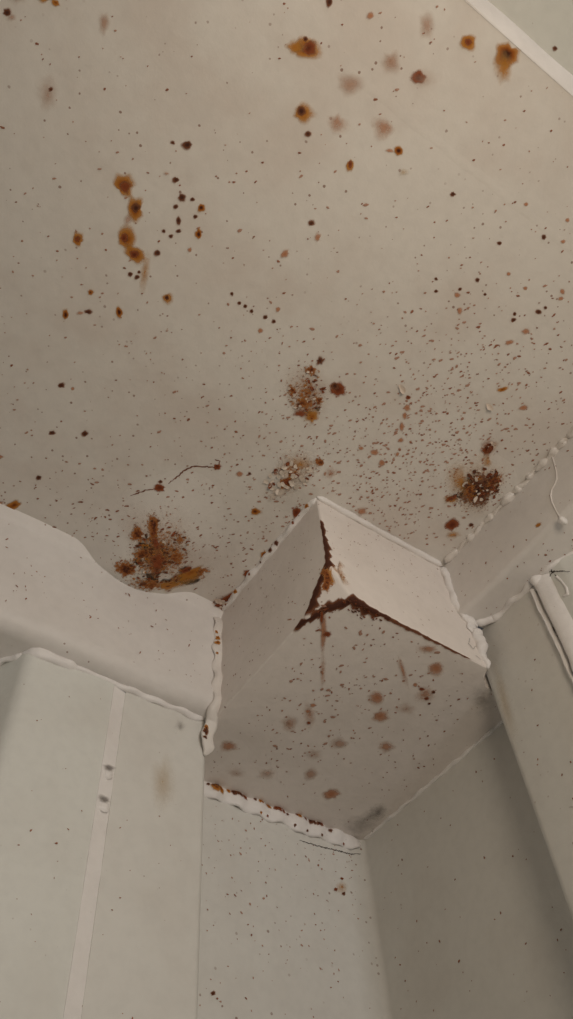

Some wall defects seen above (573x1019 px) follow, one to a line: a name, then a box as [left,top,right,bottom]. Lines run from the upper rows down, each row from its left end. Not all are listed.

corrosion [278,37,322,59]
corrosion [496,44,518,77]
corrosion [114,175,160,278]
crack [130,459,221,496]
corrosion [248,511,470,810]
corrosion [207,783,361,936]